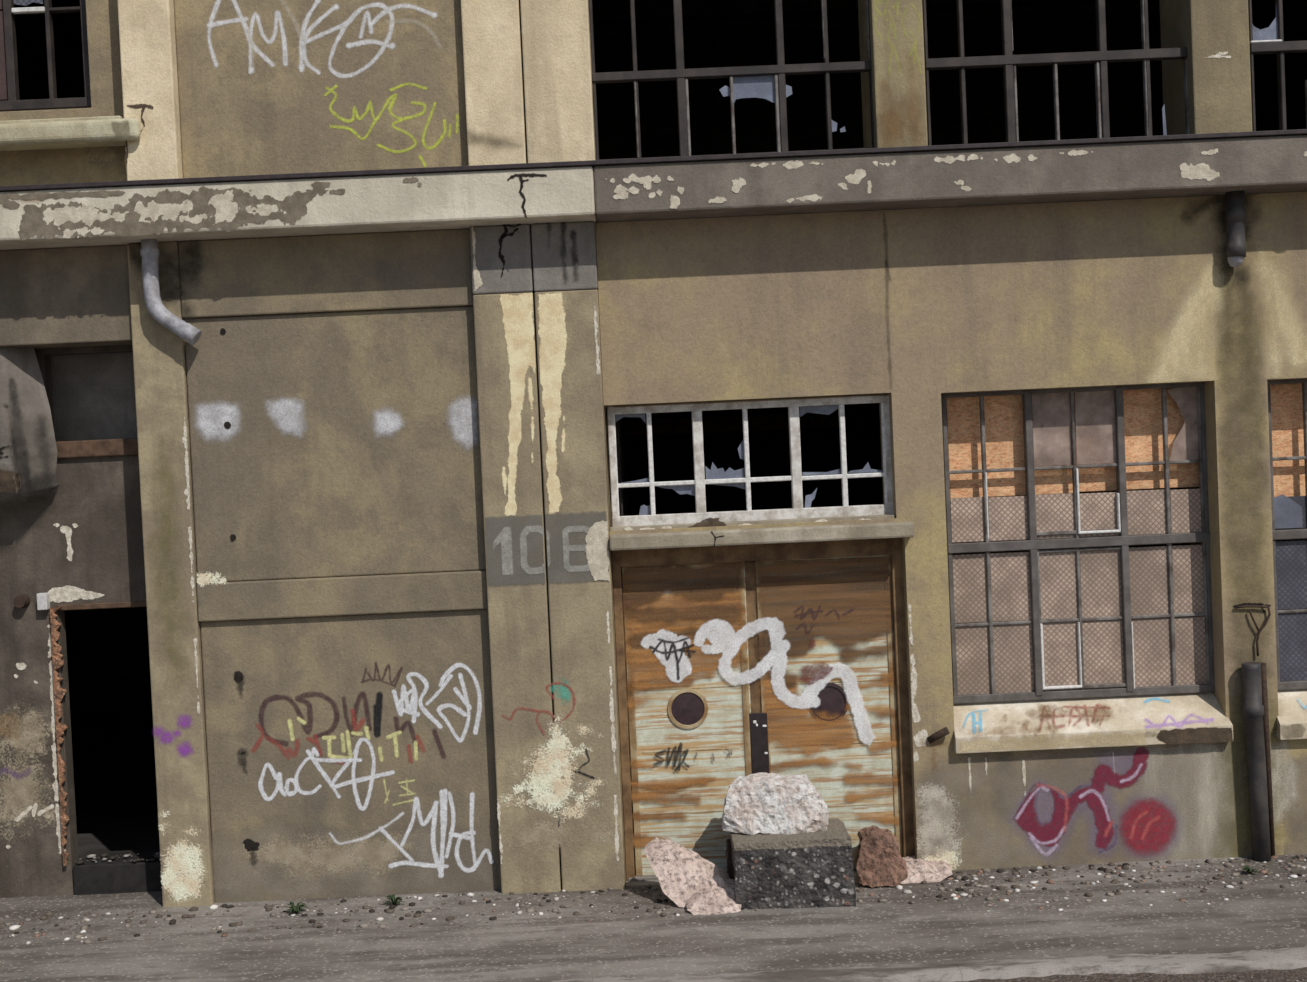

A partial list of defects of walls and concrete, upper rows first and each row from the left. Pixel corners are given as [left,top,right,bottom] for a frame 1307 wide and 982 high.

peeling [0,181,345,240]
crack [498,173,547,277]
peeling [708,160,823,203]
peeling [934,153,1037,164]
peeling [1180,148,1220,181]
damp [1149,251,1307,519]
spalling [53,523,78,561]
spalling [0,585,104,866]
spalling [497,666,619,864]
rust [631,760,713,847]
rust [622,556,900,825]
spalling [158,810,206,903]